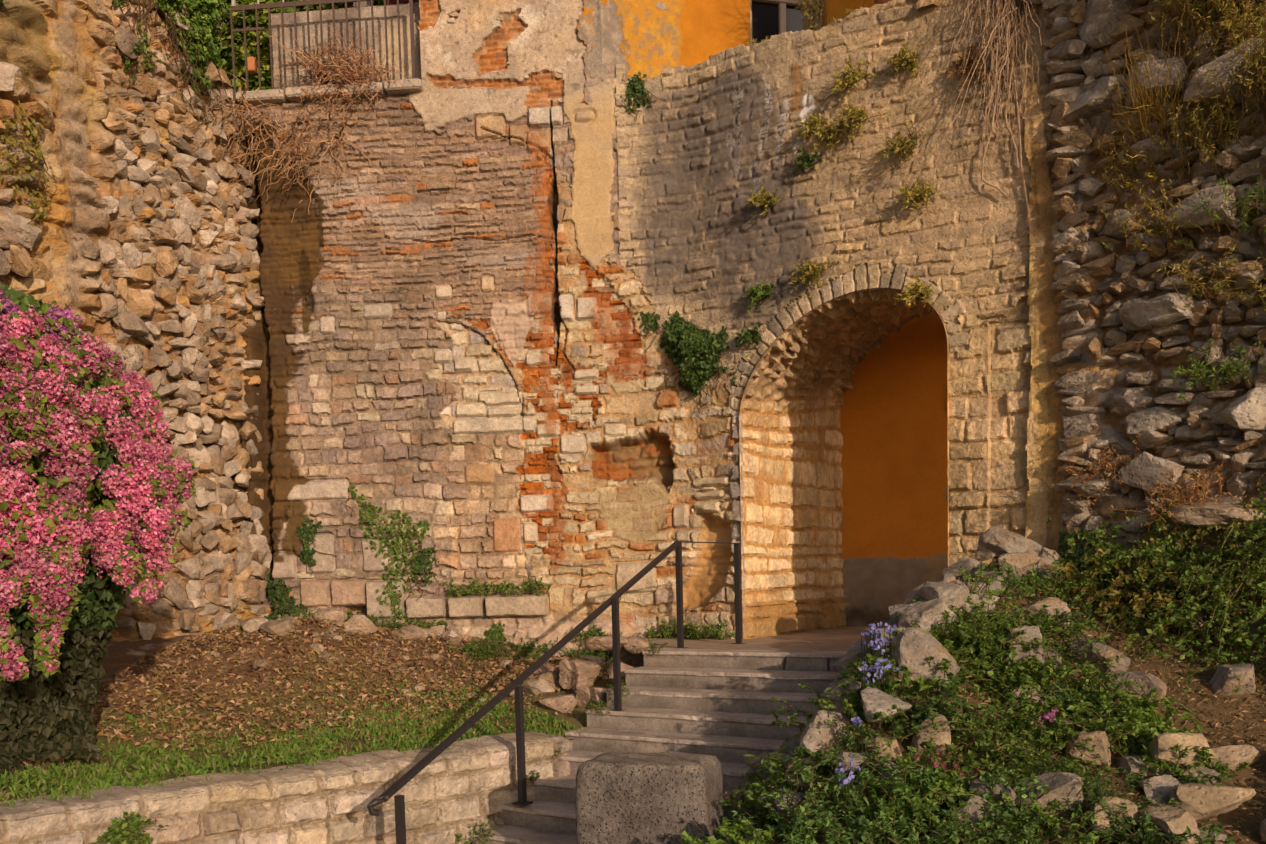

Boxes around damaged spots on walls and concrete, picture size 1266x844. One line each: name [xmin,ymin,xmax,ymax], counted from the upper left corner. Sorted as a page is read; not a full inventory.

spalling [418,0,460,30]
crack [411,117,576,371]
peeling [487,297,535,367]
peeling [427,0,632,267]